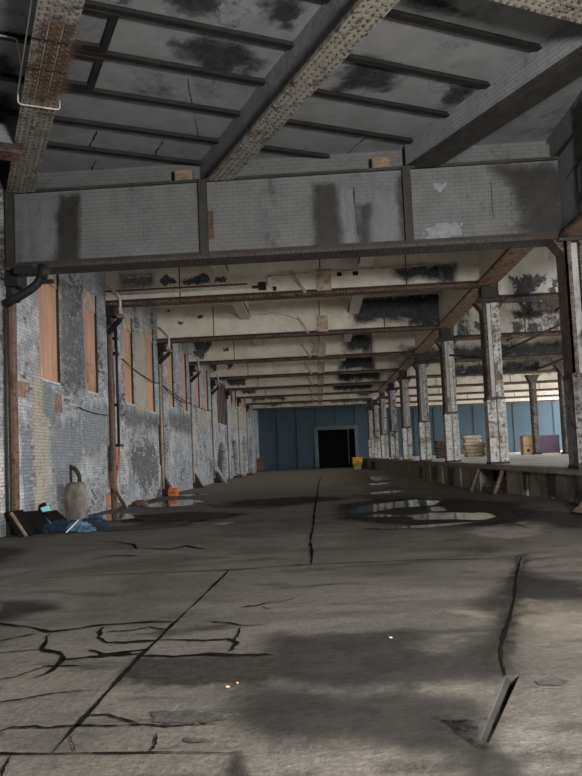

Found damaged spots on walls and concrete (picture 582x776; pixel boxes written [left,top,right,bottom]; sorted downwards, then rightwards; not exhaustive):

water stain [167,0,222,17]
water stain [263,0,301,29]
water stain [571,102,582,207]
water stain [313,177,405,245]
peeling [160,273,227,286]
peeling [508,273,558,305]
water stain [336,495,582,528]
crack [0,598,293,702]
crack [0,713,208,752]